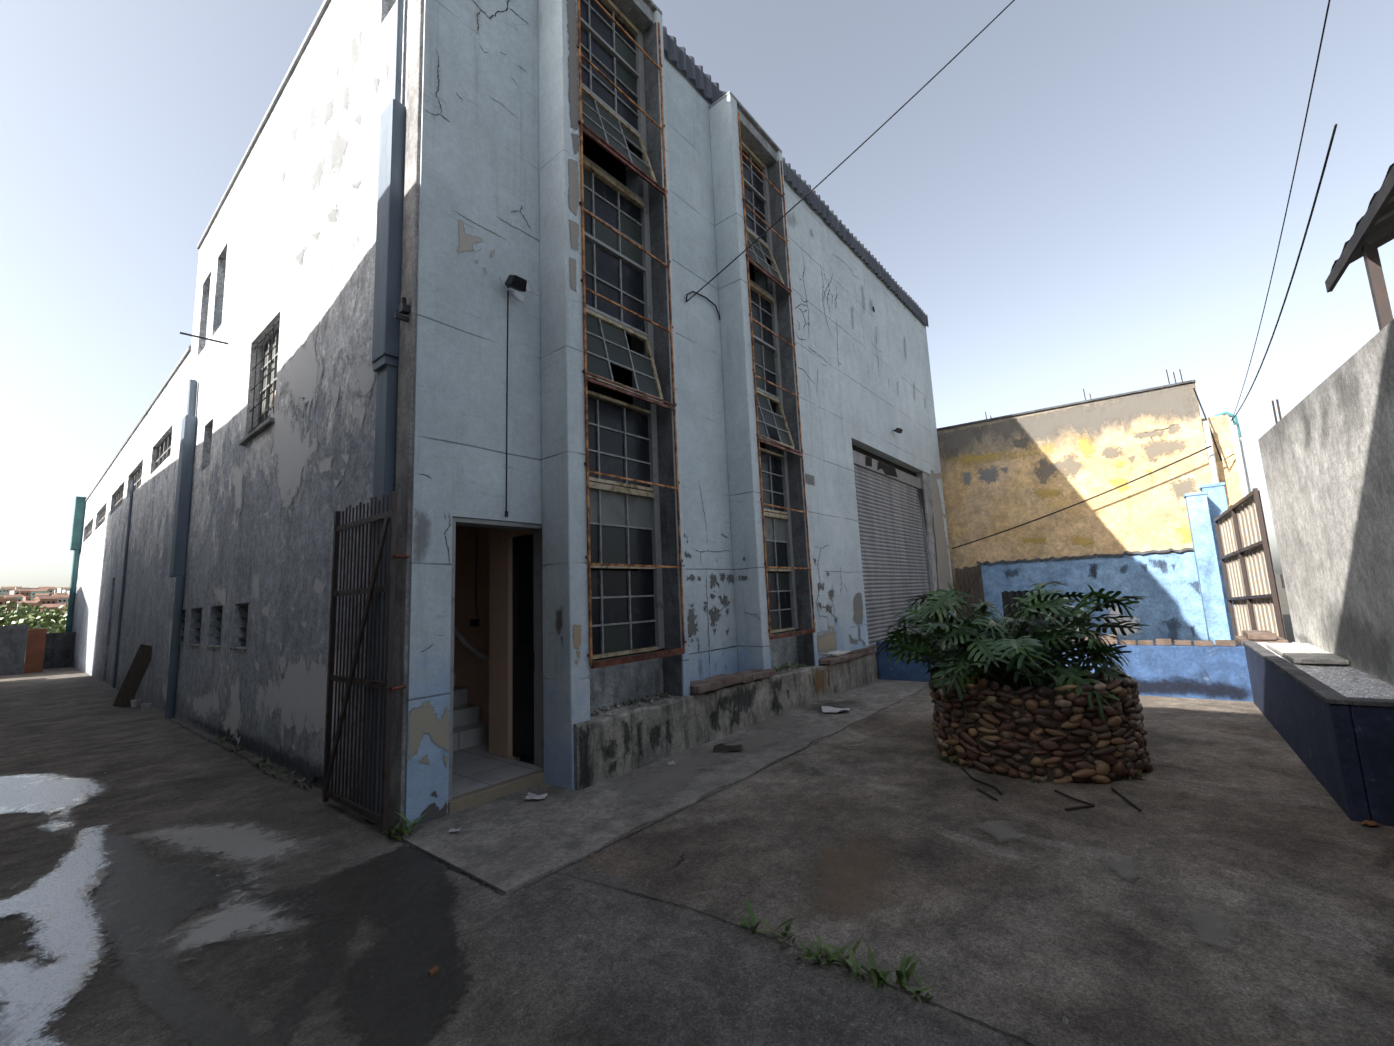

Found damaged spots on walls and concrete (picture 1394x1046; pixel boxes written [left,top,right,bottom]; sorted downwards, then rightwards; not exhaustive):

crack [426,0,525,122]
peeling [456,220,540,302]
crack [796,253,879,388]
peeling [231,320,375,520]
peeling [944,424,1186,499]
peeling [1170,478,1196,499]
peeling [162,605,350,750]
peeling [408,700,450,766]
leakage [579,679,821,797]
peeling [684,534,747,653]
peeling [1103,603,1143,639]
spalling [417,791,448,825]